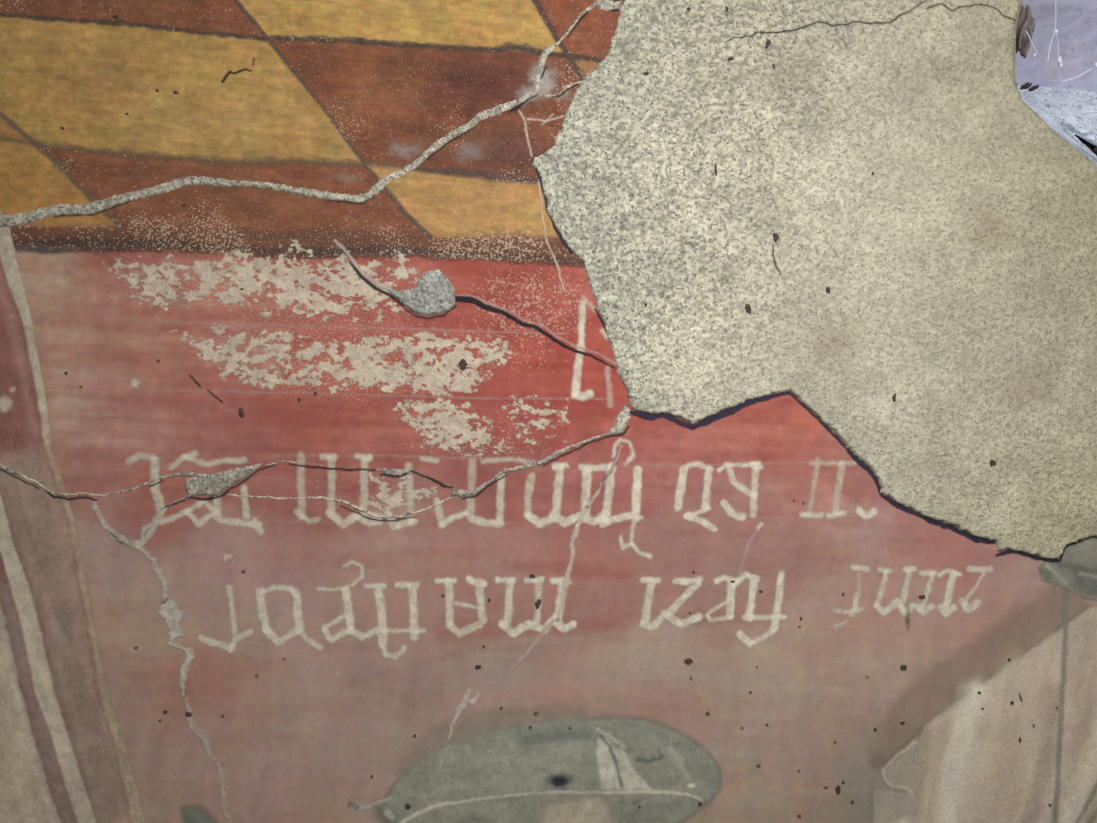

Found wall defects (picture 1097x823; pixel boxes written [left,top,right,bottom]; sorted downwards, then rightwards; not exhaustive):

crack [0,0,622,291]
peeling [103,240,570,458]
crack [334,239,616,368]
peeling [532,0,1097,559]
crack [0,391,1096,823]